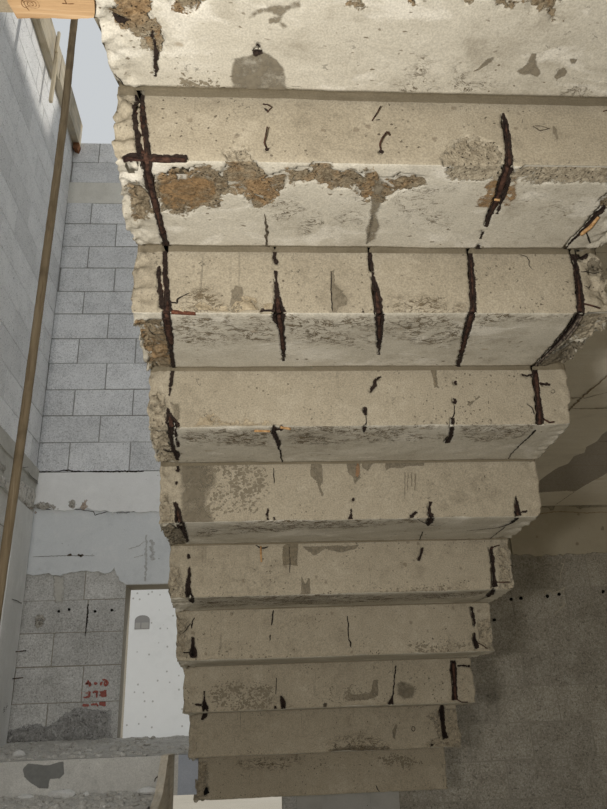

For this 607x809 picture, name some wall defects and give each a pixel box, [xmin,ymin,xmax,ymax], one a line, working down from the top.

spalling [108,0,163,51]
spalling [171,0,206,14]
peeling [253,2,300,27]
spalling [344,0,366,11]
spalling [495,0,566,22]
water stain [232,48,286,90]
spalling [439,136,607,185]
spalling [124,145,432,222]
spalling [134,319,171,368]
peeling [177,317,273,346]